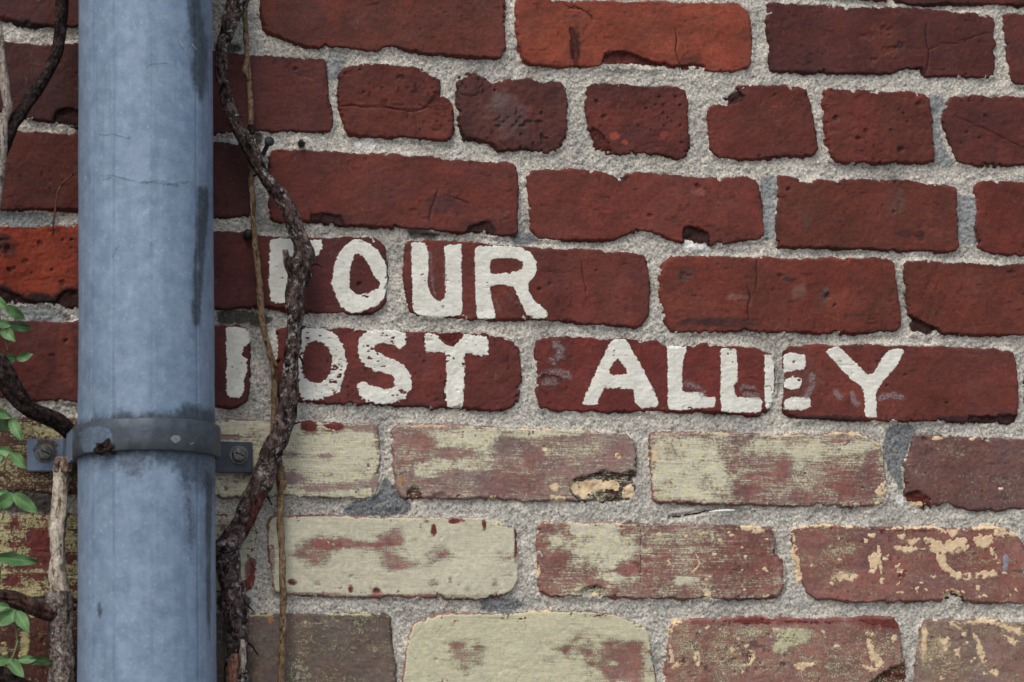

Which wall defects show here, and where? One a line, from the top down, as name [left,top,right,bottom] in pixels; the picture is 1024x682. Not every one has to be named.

peeling [392,424,637,503]
peeling [536,521,1024,602]
peeling [247,610,1024,682]